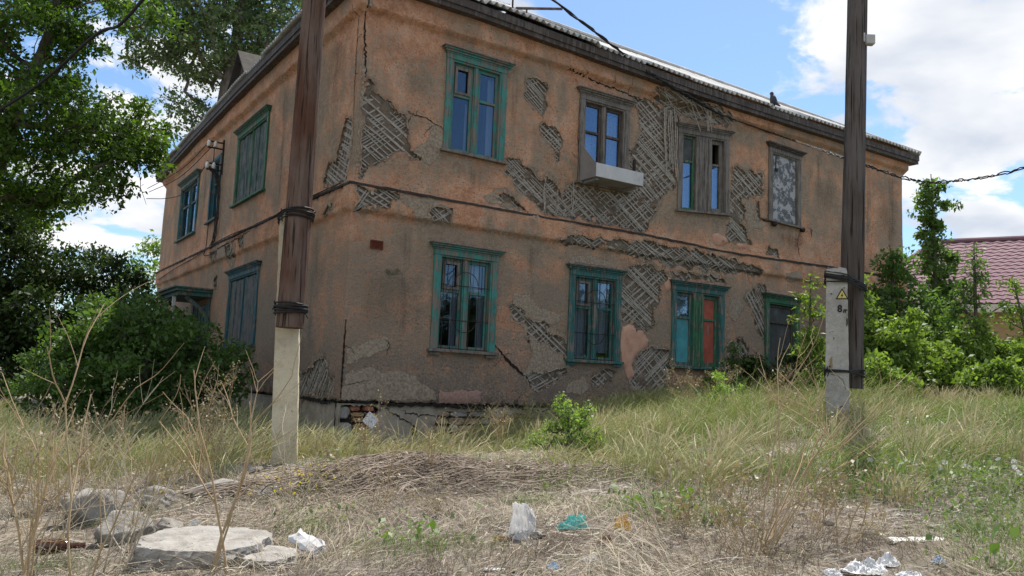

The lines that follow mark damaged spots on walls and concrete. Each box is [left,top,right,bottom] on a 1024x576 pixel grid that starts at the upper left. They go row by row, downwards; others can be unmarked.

crack [353,0,369,86]
spalling [322,77,453,224]
spalling [484,75,770,395]
peeling [299,336,436,402]
crack [299,320,556,426]